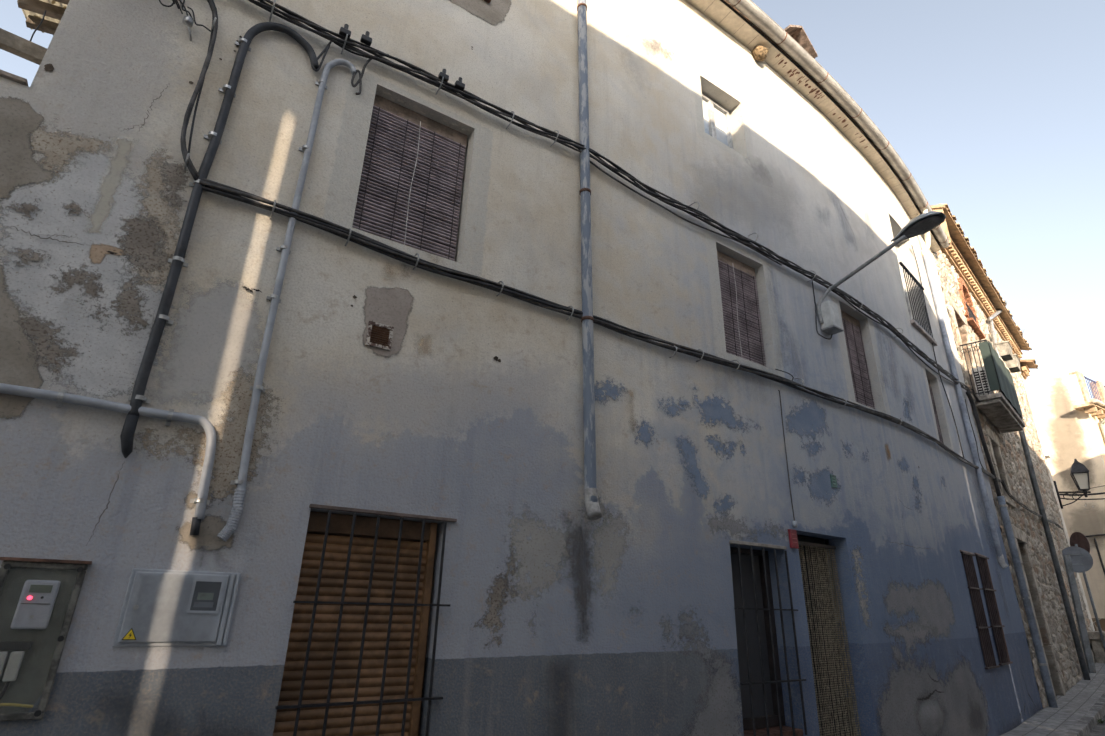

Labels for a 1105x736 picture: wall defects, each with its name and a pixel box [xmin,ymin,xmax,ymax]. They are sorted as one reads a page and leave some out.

peeling [0,126,280,509]
crack [86,463,124,546]
peeling [595,380,625,405]
peeling [658,388,761,456]
peeling [676,436,789,541]
damp [1052,387,1092,489]
spalling [471,543,522,649]
damp [563,522,591,640]